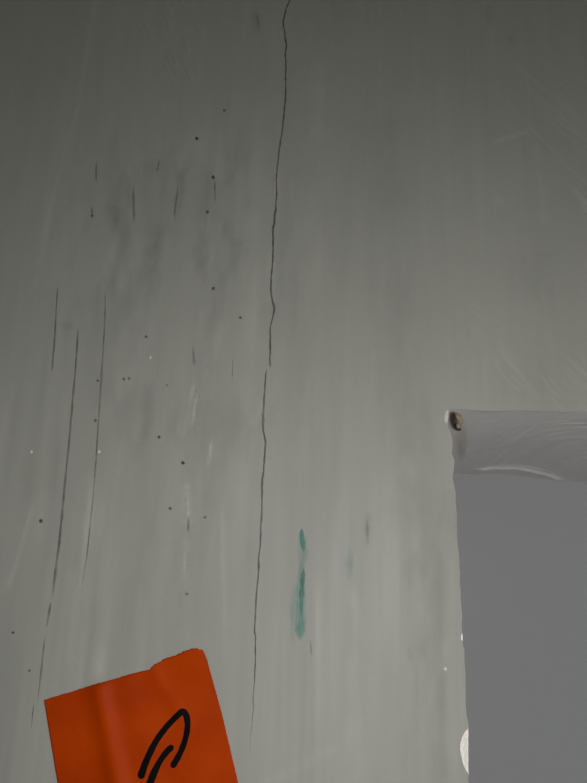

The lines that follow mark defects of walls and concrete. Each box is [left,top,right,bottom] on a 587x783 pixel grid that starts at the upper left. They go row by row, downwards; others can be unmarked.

crack [263,0,290,404]
crack [259,427,267,498]
crack [254,519,262,683]